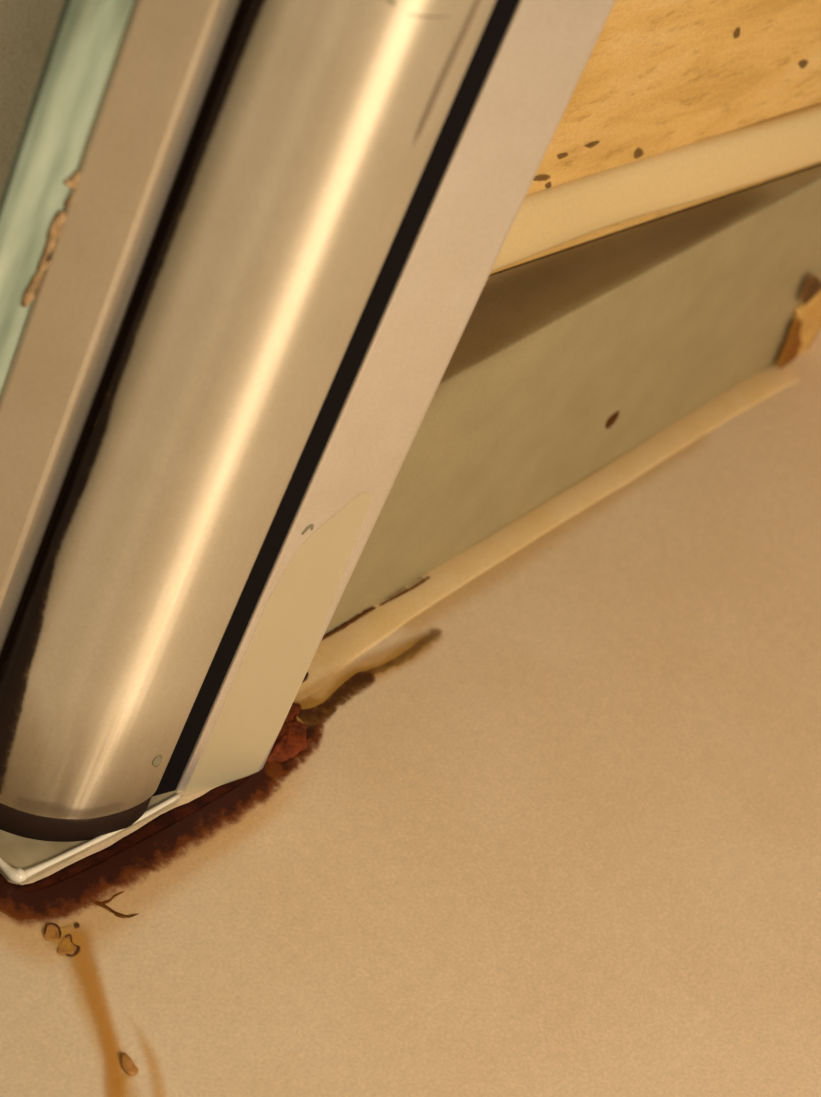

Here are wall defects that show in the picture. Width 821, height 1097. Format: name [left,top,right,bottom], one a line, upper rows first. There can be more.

corrosion [0,630,441,923]
corrosion [67,932,139,1097]